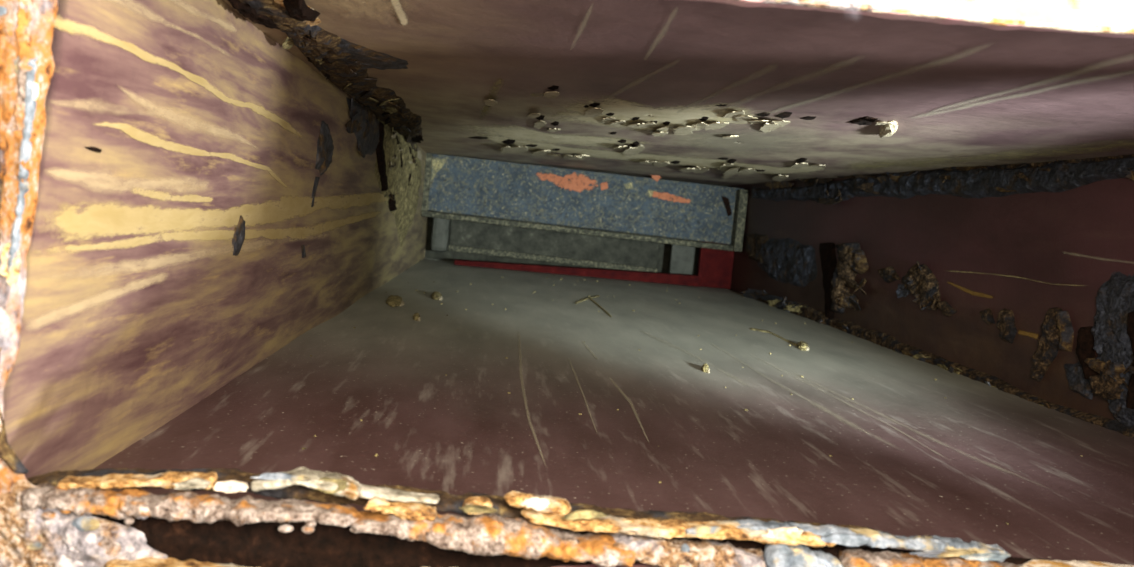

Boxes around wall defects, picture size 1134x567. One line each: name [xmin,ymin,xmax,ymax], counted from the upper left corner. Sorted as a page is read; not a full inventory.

peeling [228,0,423,144]
peeling [311,121,334,207]
peeling [527,113,561,132]
peeling [498,139,590,160]
peeling [583,101,826,182]
spalling [849,116,893,126]
rust [0,0,301,493]
rust [30,97,422,328]
peeling [819,242,957,319]
peeling [1030,271,1134,426]
rust [18,467,1134,567]